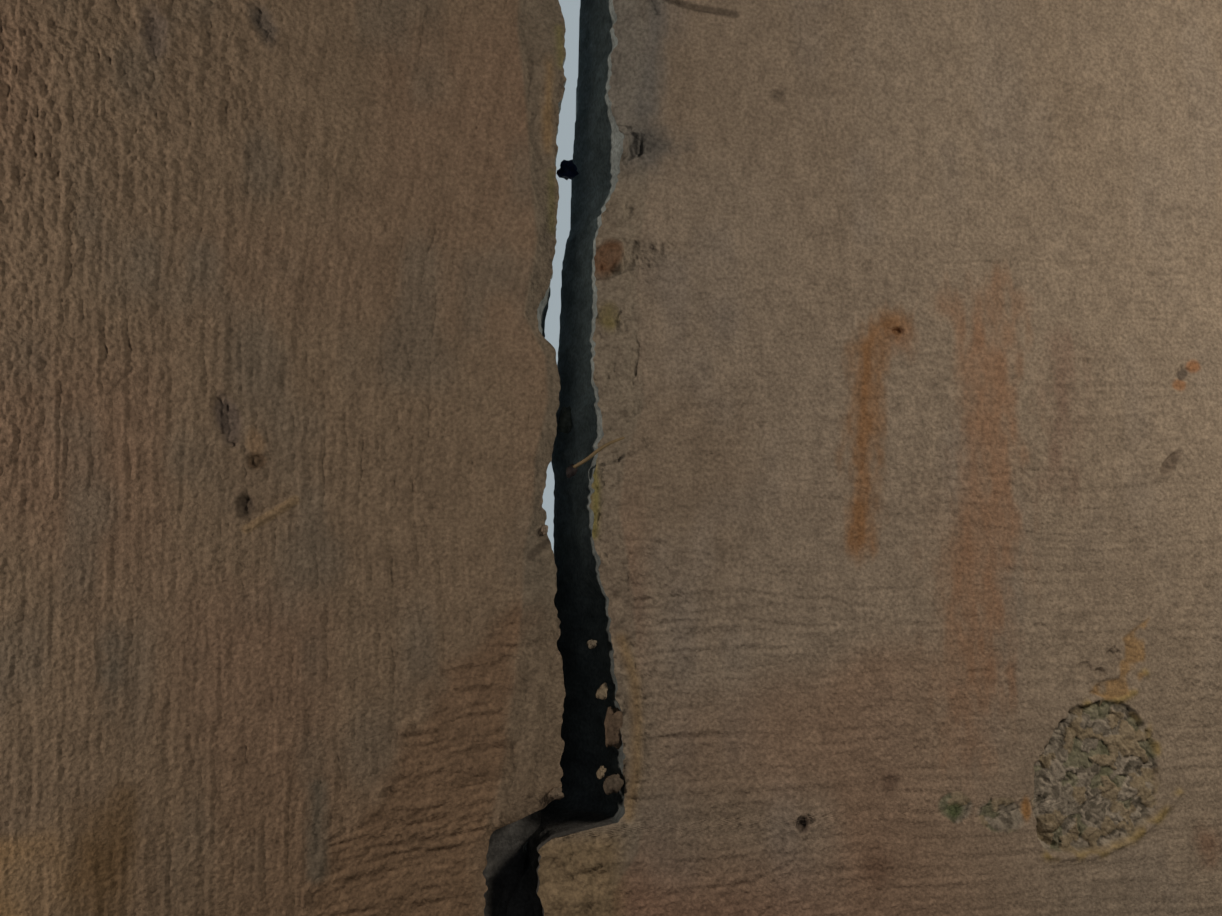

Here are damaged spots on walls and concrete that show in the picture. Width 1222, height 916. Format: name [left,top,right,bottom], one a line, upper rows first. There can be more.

crack [672,0,741,20]
crack [477,0,650,916]
spalling [928,670,1186,865]